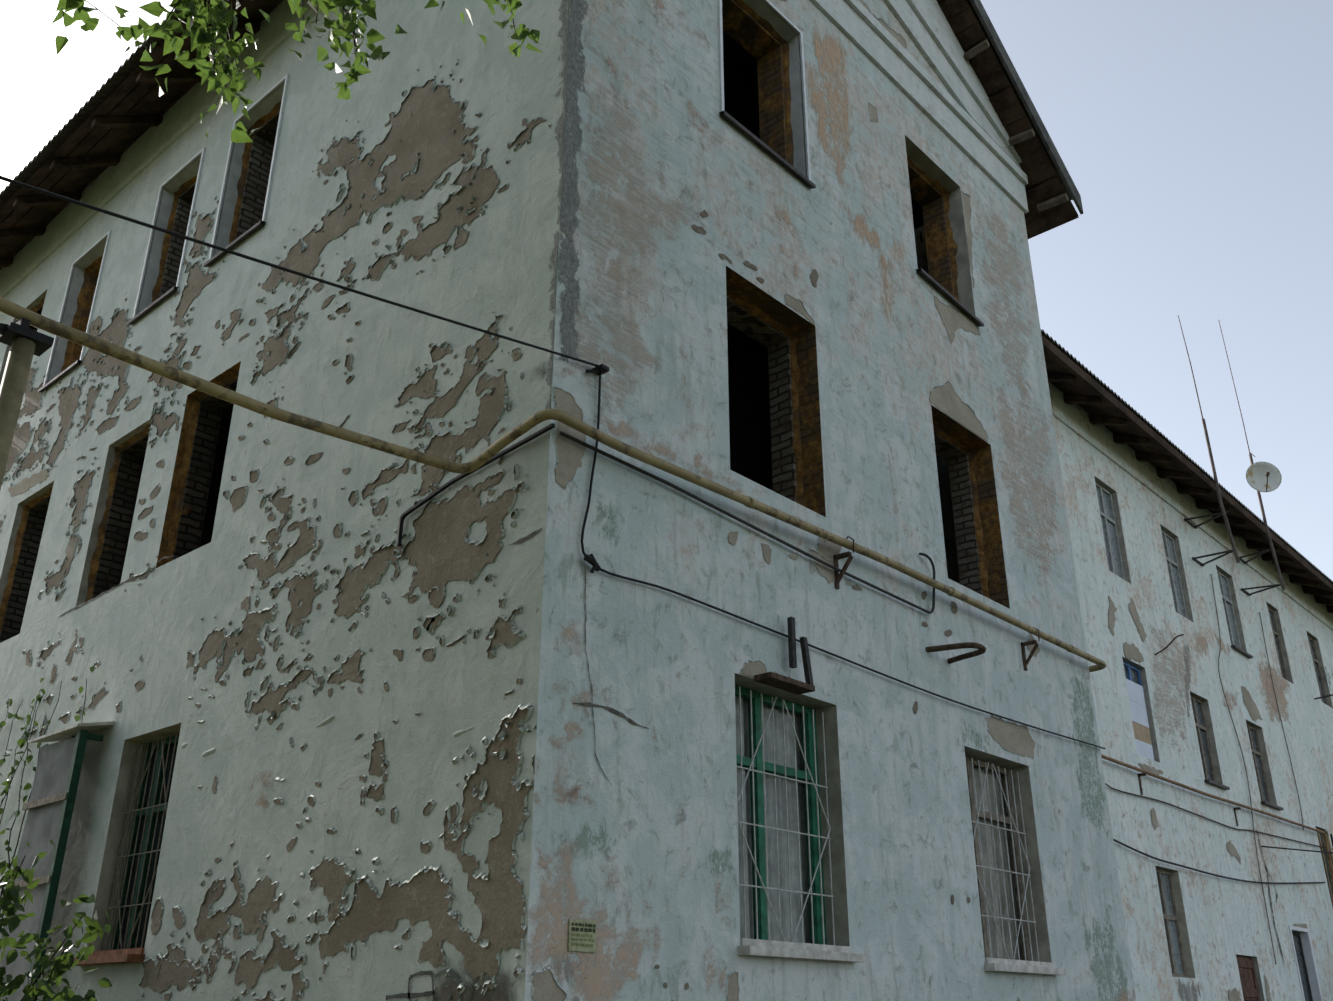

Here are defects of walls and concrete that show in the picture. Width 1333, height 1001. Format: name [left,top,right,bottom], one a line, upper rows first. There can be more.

peeling [2,196,225,602]
peeling [186,311,528,752]
peeling [215,0,656,490]
peeling [692,210,708,235]
peeling [719,253,764,283]
peeling [781,247,819,287]
peeling [137,677,567,1001]
leakage [435,972,511,1001]